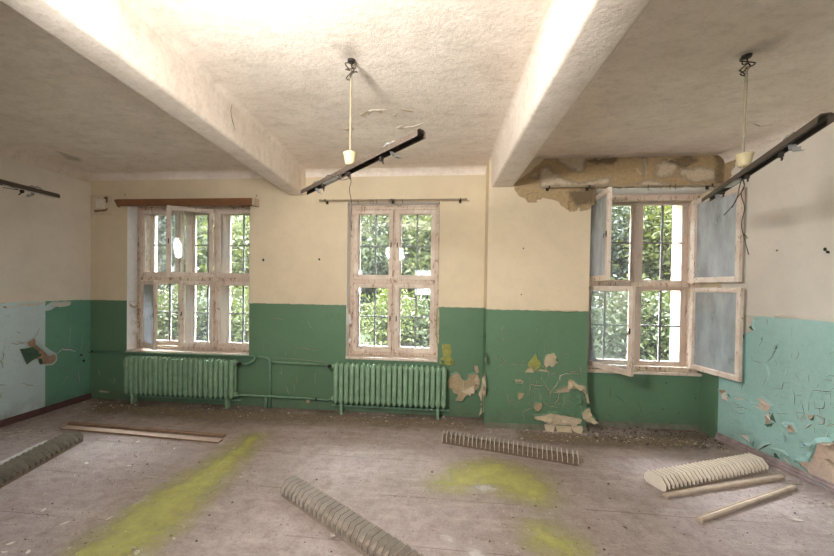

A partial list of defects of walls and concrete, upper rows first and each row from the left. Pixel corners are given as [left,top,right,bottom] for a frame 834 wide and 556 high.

peeling [0,328,91,368]
peeling [436,309,487,415]
peeling [514,352,559,400]
peeling [532,373,599,434]
peeling [743,313,764,341]
spalling [718,388,834,490]